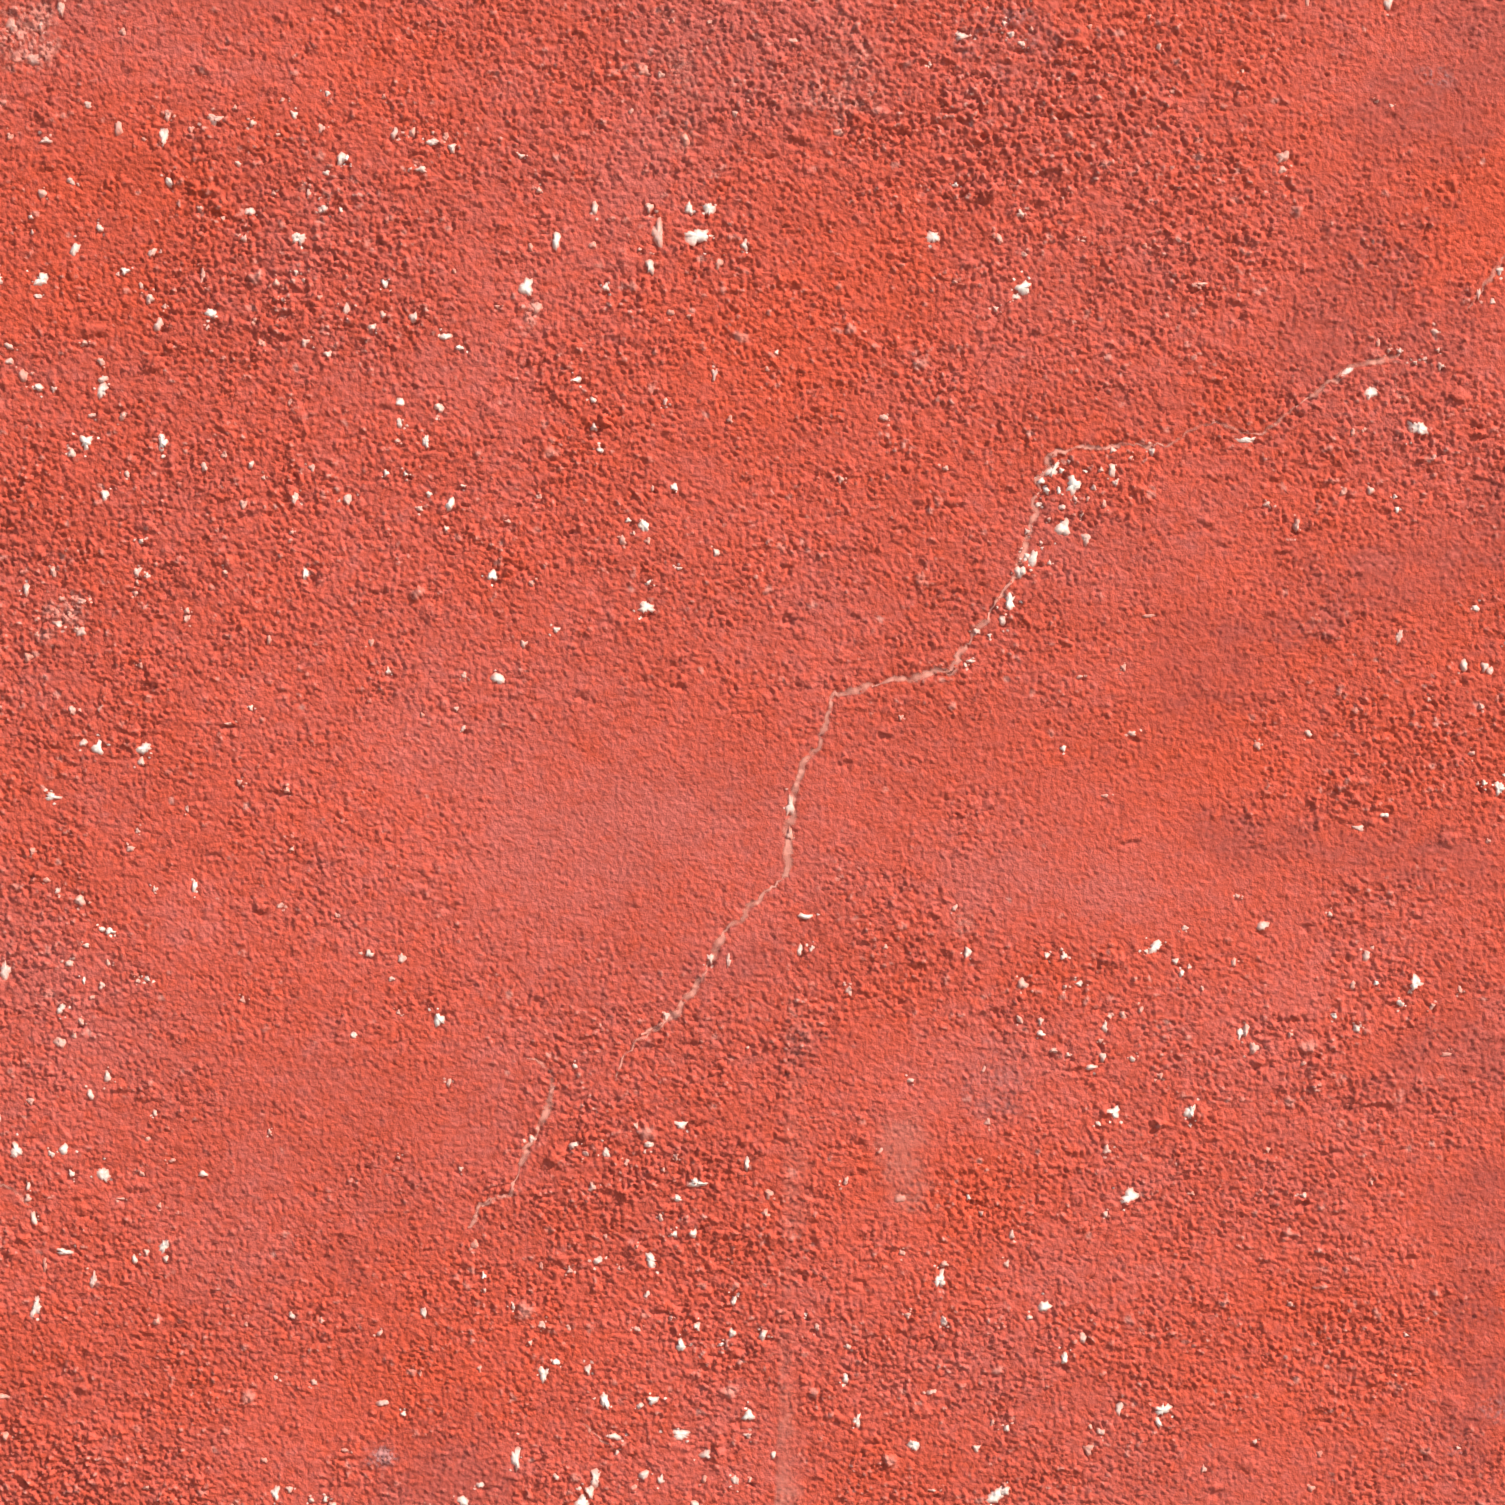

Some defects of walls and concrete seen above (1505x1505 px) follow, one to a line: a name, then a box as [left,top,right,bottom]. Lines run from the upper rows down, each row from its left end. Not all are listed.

crack [616,354,1399,1078]
crack [468,1058,554,1228]